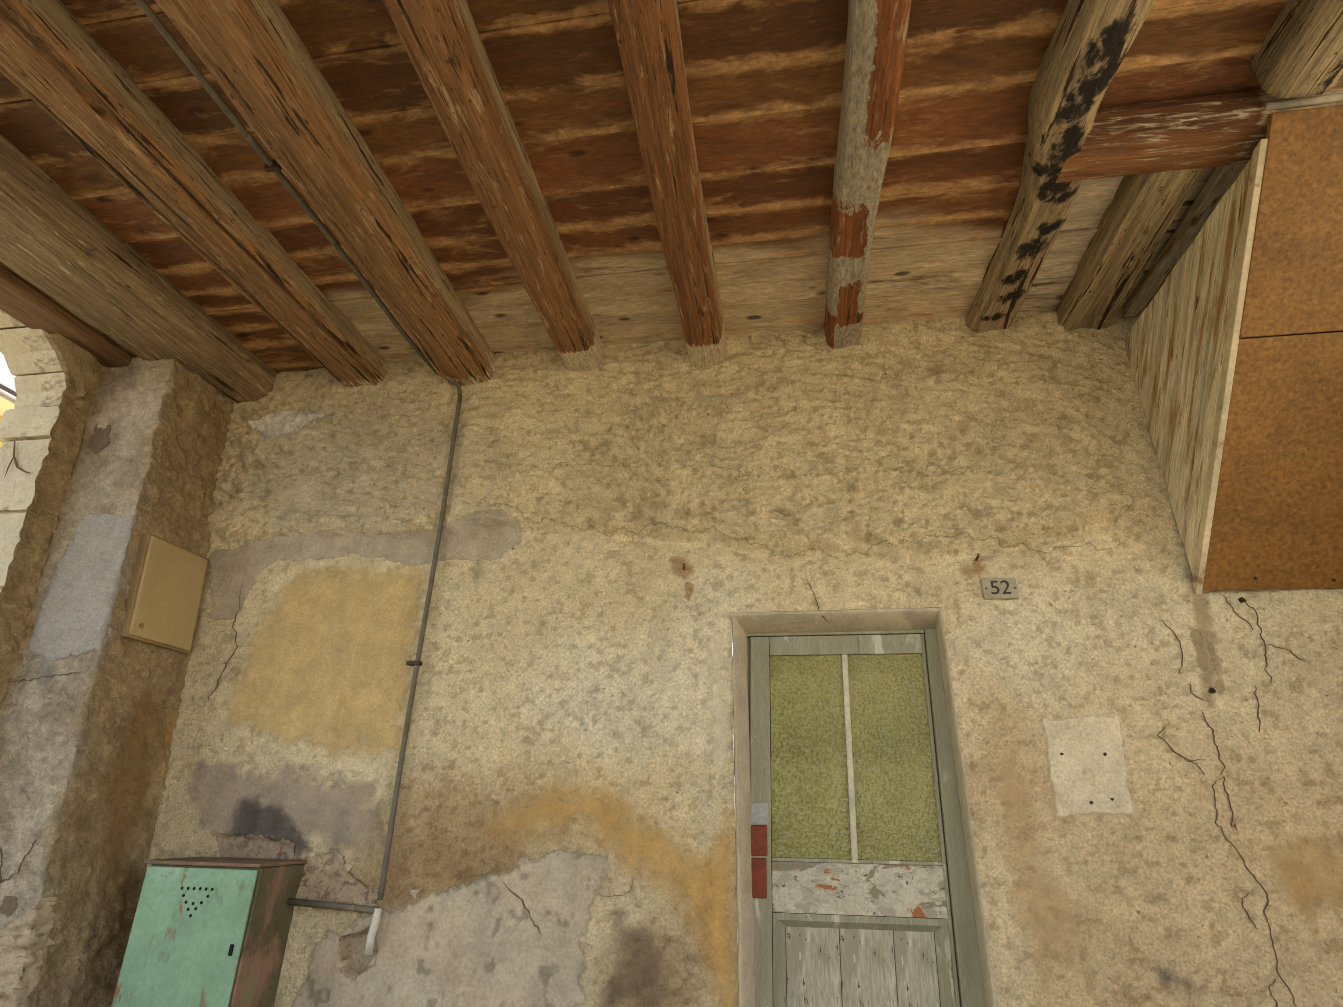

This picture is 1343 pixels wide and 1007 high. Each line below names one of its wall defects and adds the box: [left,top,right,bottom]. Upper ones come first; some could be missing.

crack [1223,596,1307,732]
damp [195,763,372,845]
crack [1157,621,1297,1007]
flaking render [216,833,610,1007]